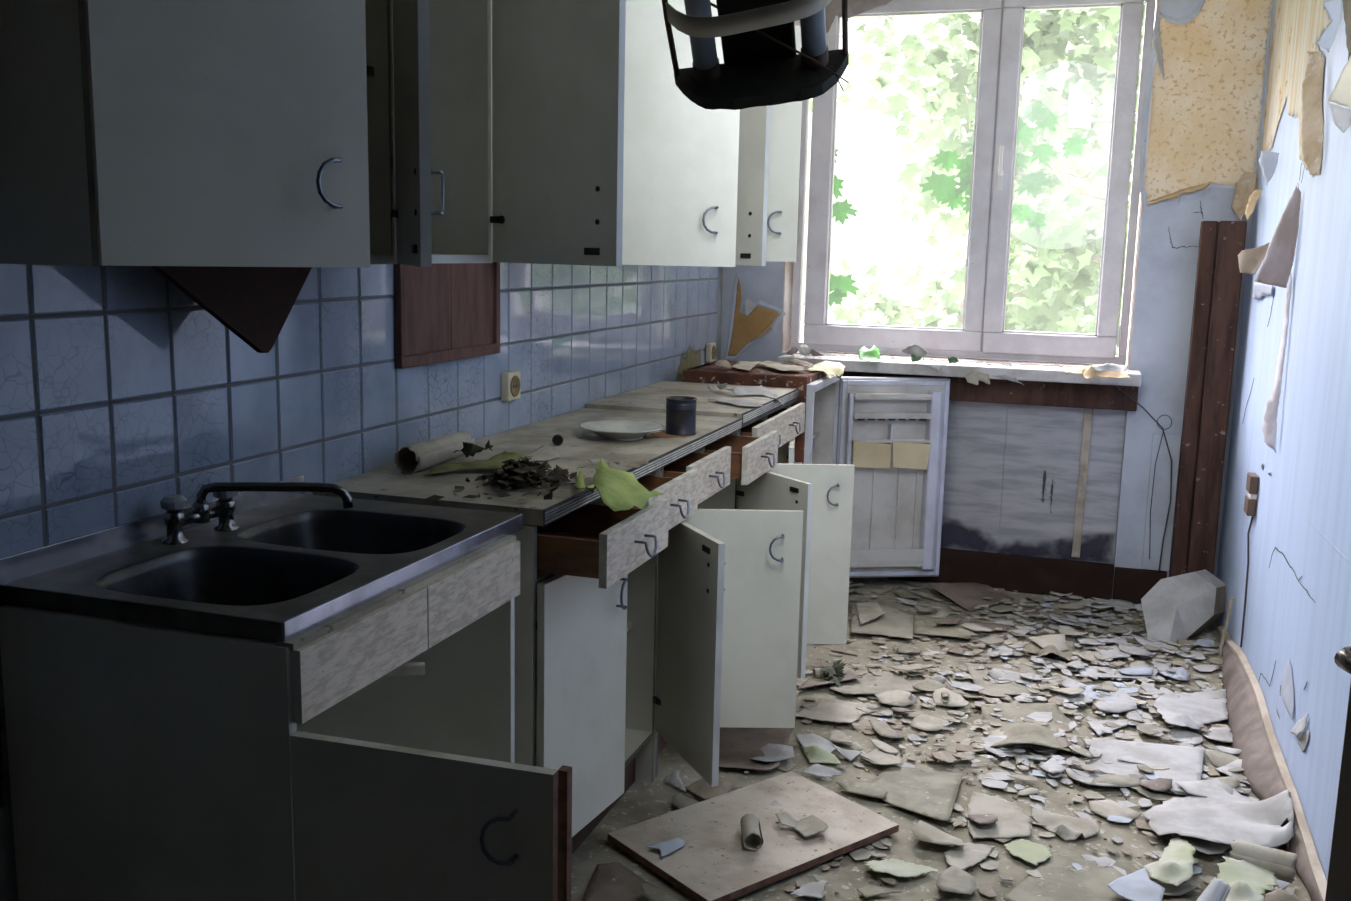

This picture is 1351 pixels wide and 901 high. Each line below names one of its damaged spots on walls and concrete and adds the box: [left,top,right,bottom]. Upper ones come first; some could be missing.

peeling [1140,0,1273,212]
peeling [725,271,786,361]
crack [1269,547,1315,602]
peeling [1290,714,1310,752]